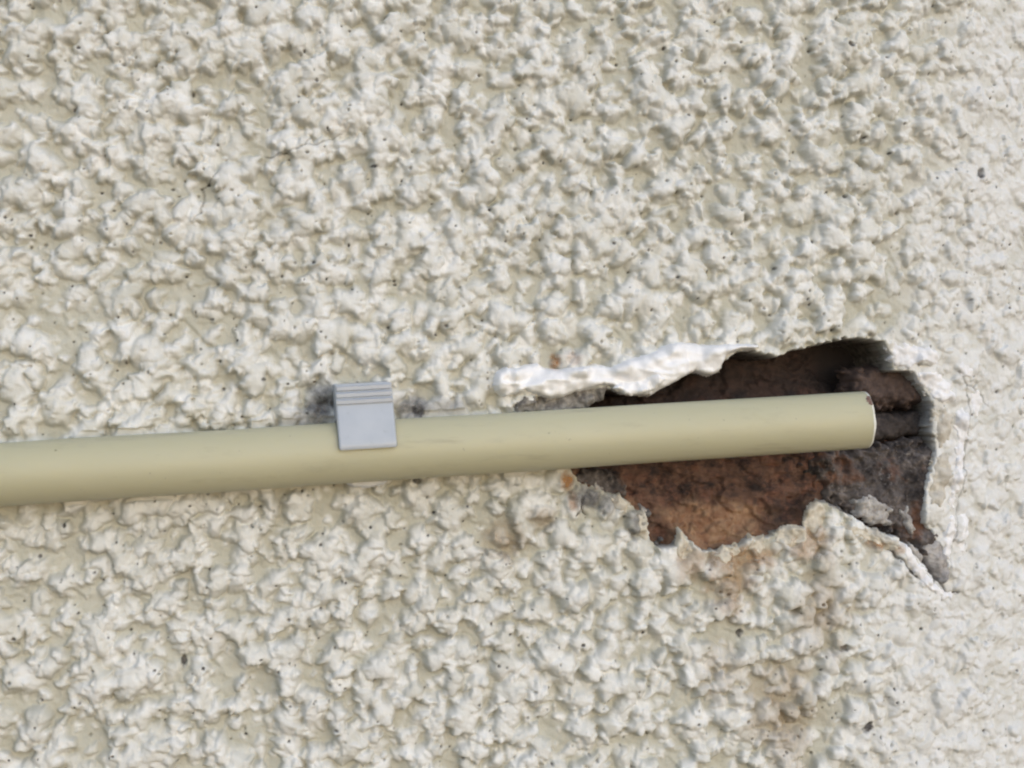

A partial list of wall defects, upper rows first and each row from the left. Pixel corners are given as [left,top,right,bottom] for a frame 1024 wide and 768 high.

spalling [514,342,982,600]